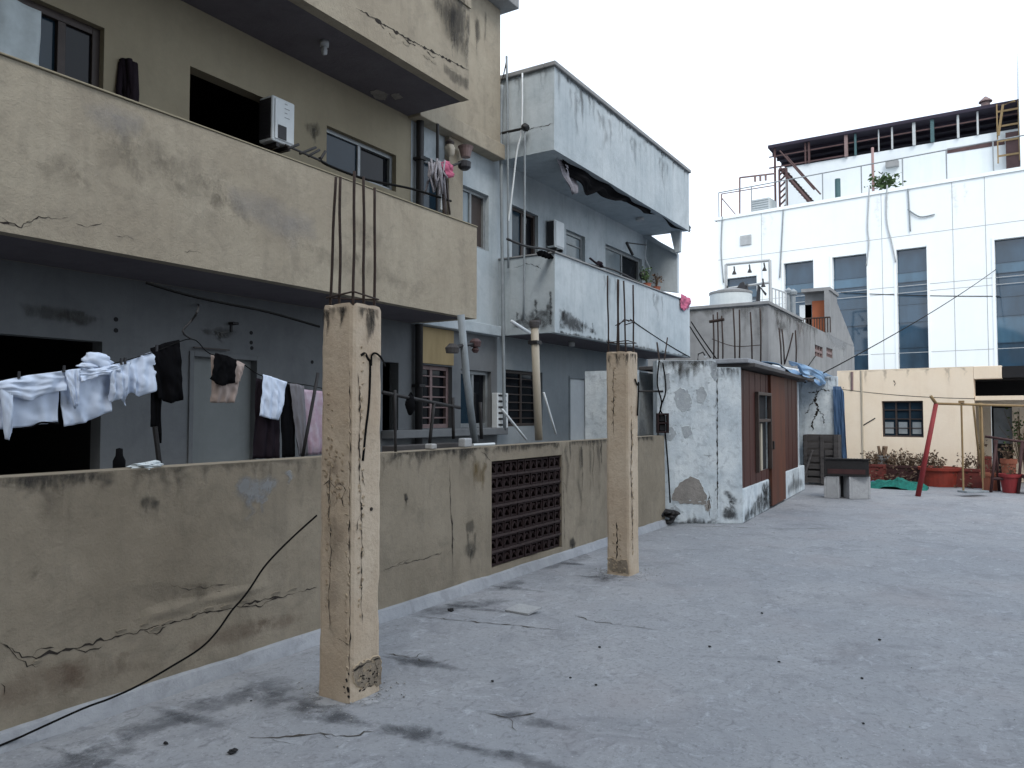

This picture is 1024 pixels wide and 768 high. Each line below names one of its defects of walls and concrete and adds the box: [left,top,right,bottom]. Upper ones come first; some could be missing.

crack [360,10,467,72]
water stain [437,0,469,46]
crack [0,216,134,240]
water stain [515,292,704,366]
peeling [659,308,762,444]
crack [805,389,829,431]
crack [1,346,454,680]
spalling [669,476,712,520]
mould [724,485,772,520]
spalling [343,655,382,698]